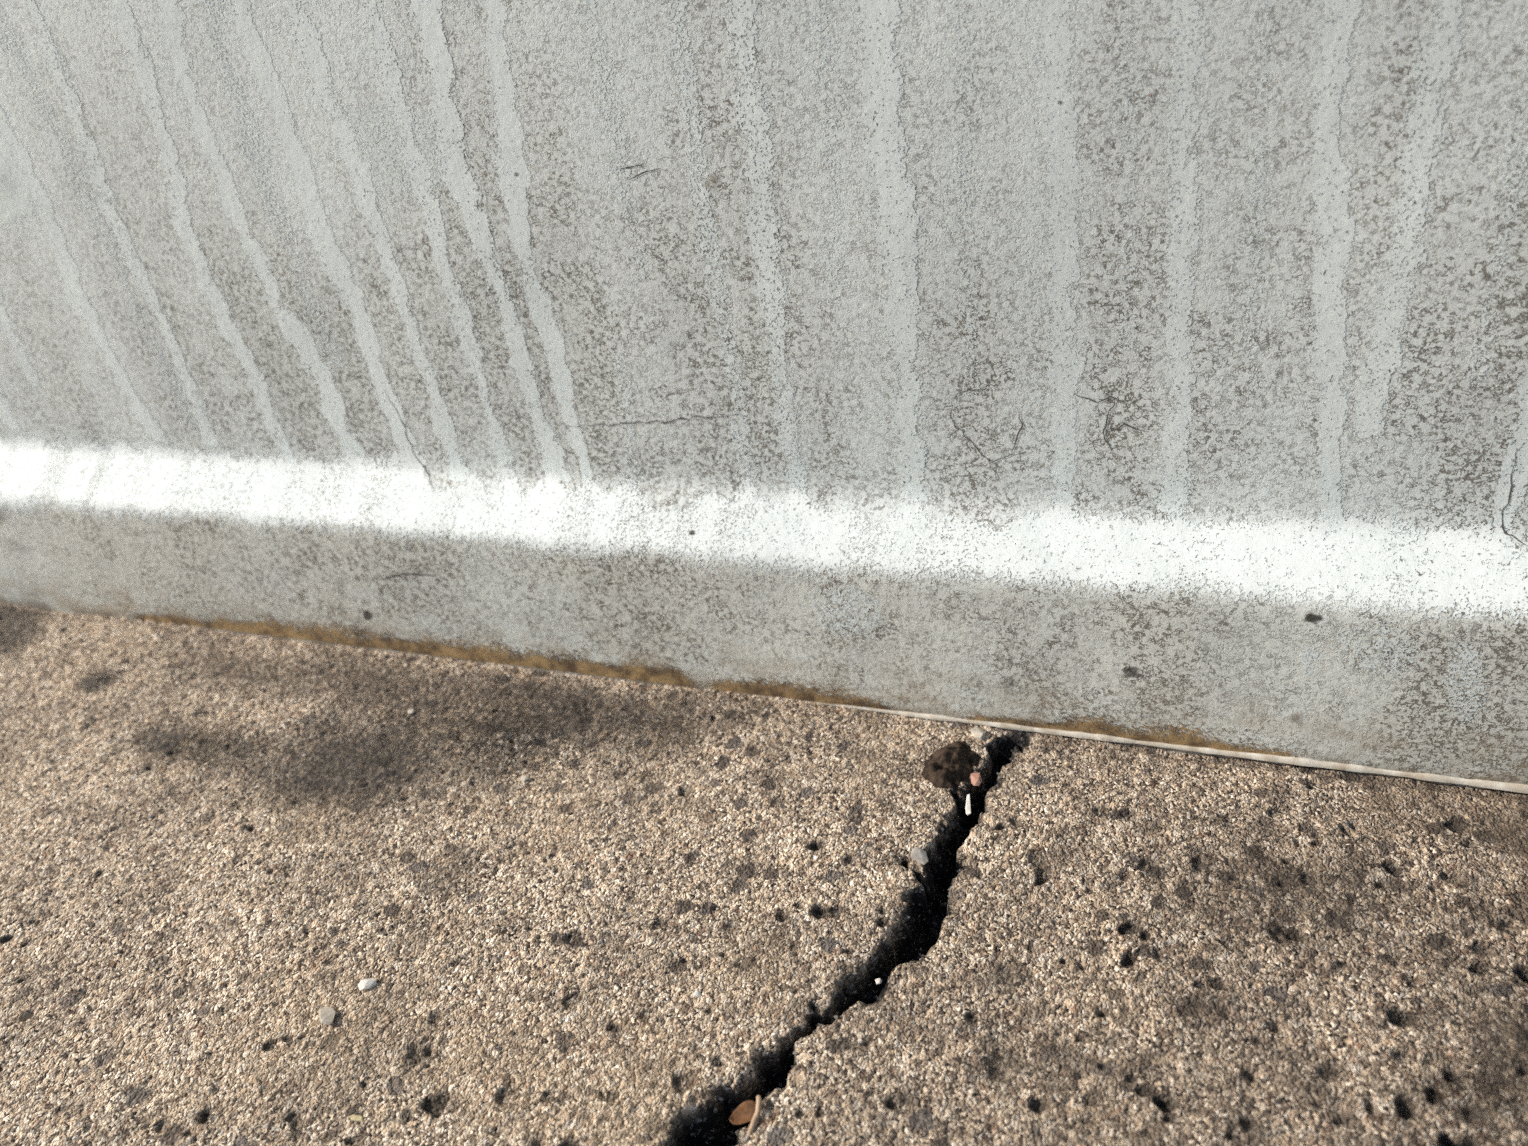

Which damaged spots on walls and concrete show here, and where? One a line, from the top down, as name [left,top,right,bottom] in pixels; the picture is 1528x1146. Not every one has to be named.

leakage [0,0,1528,724]
leakage [141,729,225,756]
leakage [276,724,431,801]
leakage [463,696,590,772]
crack [650,729,1039,1146]